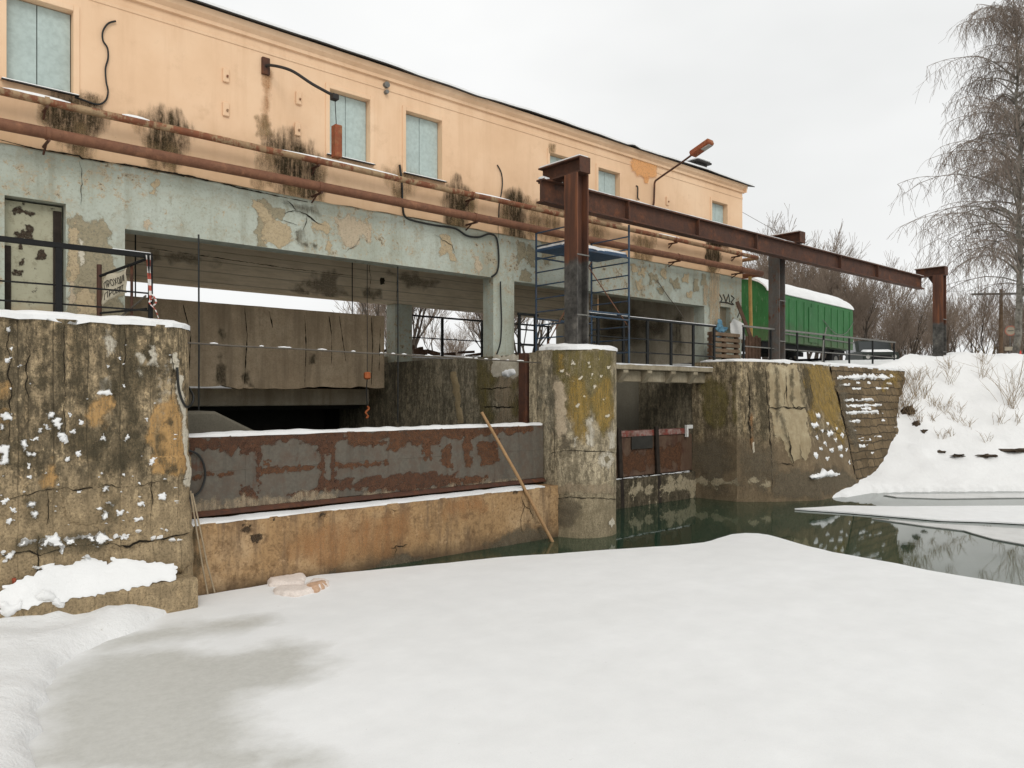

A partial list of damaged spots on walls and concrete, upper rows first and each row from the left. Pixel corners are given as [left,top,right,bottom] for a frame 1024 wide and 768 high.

water stain [41,95,104,155]
water stain [147,107,188,170]
corrosion [258,76,273,136]
water stain [260,130,325,212]
peeling [252,199,293,249]
water stain [502,188,559,240]
peeling [65,214,125,316]
water stain [40,320,187,476]
corrosion [189,426,534,507]
water stain [560,417,616,449]
crack [747,369,806,489]
crack [0,479,190,571]